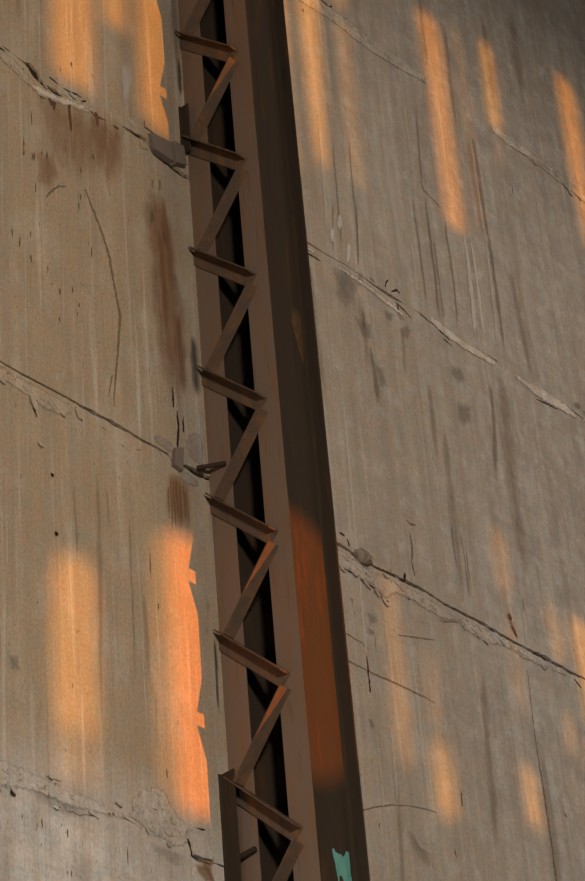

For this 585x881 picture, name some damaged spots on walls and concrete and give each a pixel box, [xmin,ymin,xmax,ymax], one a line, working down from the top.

crack [22,65,187,179]
crack [370,278,452,346]
crack [172,387,184,447]
crack [183,467,209,480]
crack [337,520,415,602]
crack [399,609,458,640]
crack [346,633,434,703]
crack [527,650,582,881]
crack [187,827,211,865]